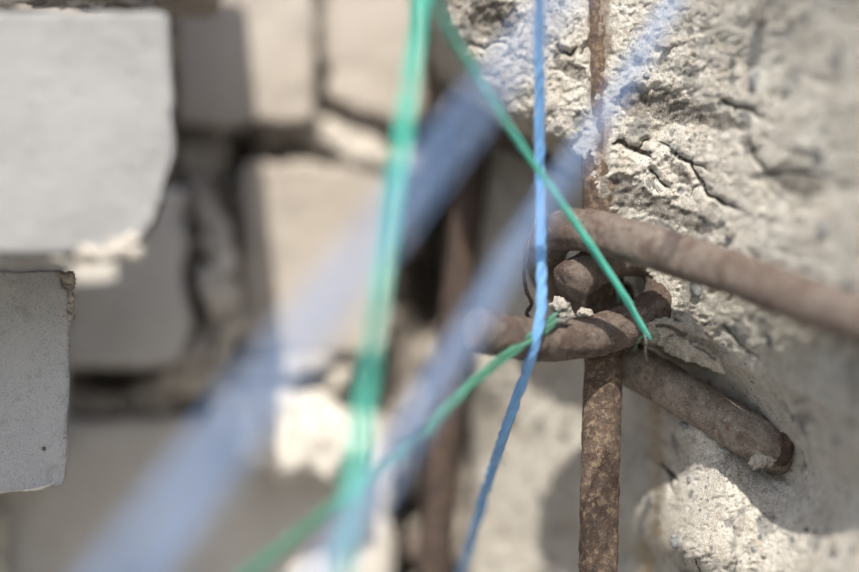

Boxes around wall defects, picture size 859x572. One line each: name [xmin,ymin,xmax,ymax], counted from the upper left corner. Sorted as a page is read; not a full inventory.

spalling [402,0,859,572]
crack [611,138,747,213]